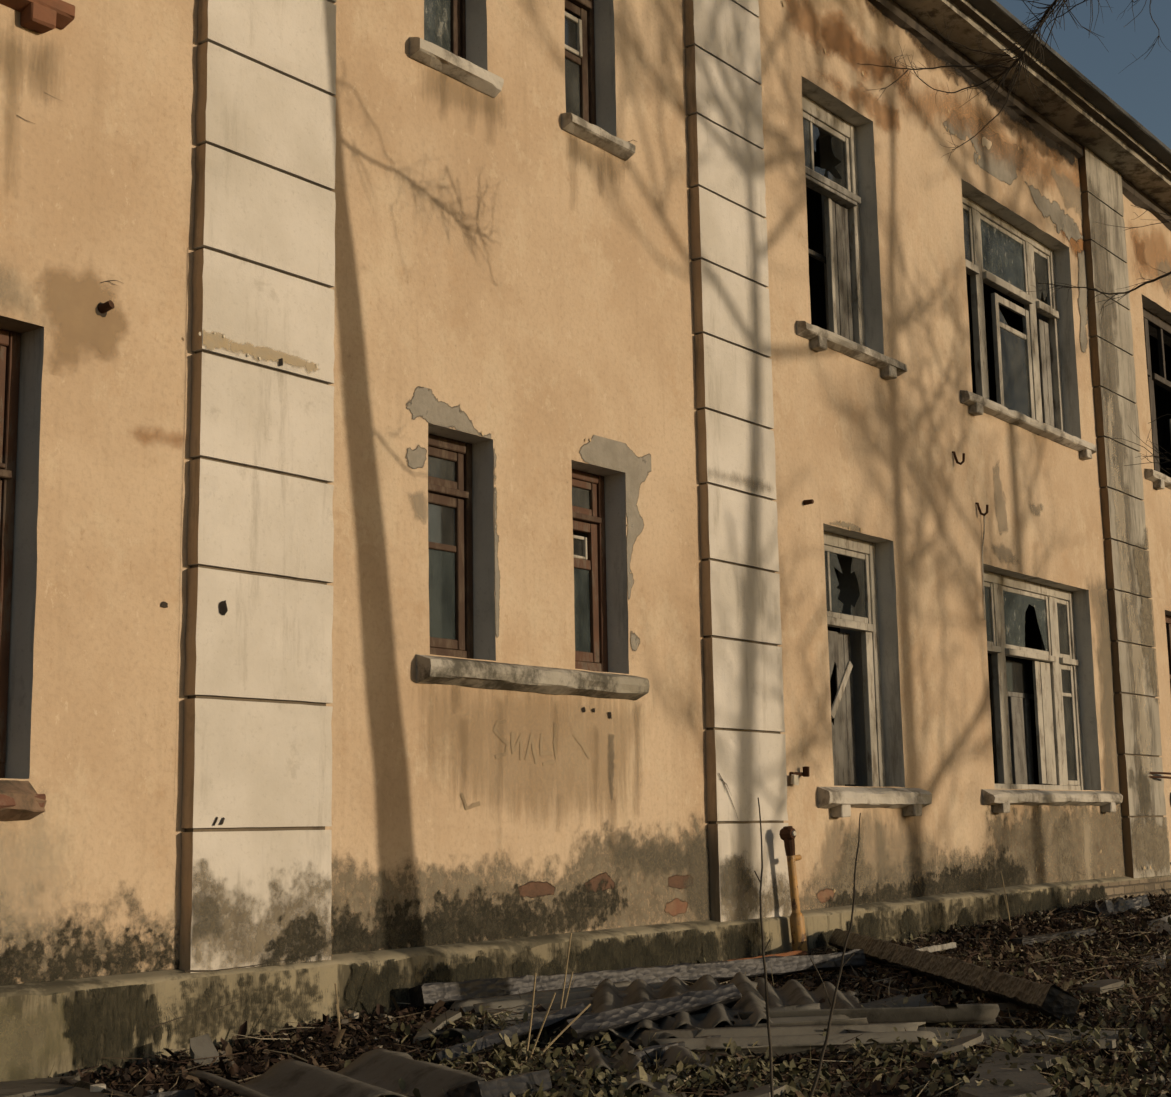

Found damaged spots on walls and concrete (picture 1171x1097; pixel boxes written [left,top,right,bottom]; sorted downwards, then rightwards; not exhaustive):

water stain [782,0,910,88]
water stain [837,84,899,129]
peeling [943,109,1084,242]
peeling [198,330,319,372]
peeling [406,386,500,638]
peeling [579,435,651,599]
water stain [1134,529,1160,703]
water stain [0,770,1170,986]